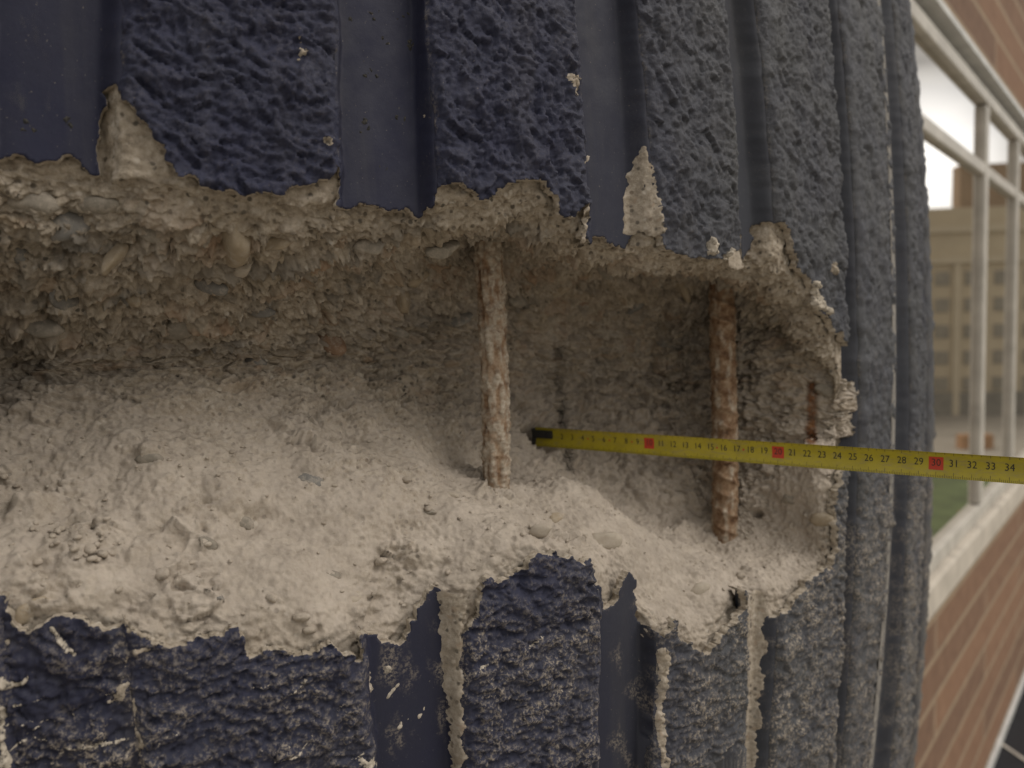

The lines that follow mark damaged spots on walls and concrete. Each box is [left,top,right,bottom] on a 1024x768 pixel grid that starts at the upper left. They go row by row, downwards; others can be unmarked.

spalling [0,87,859,768]